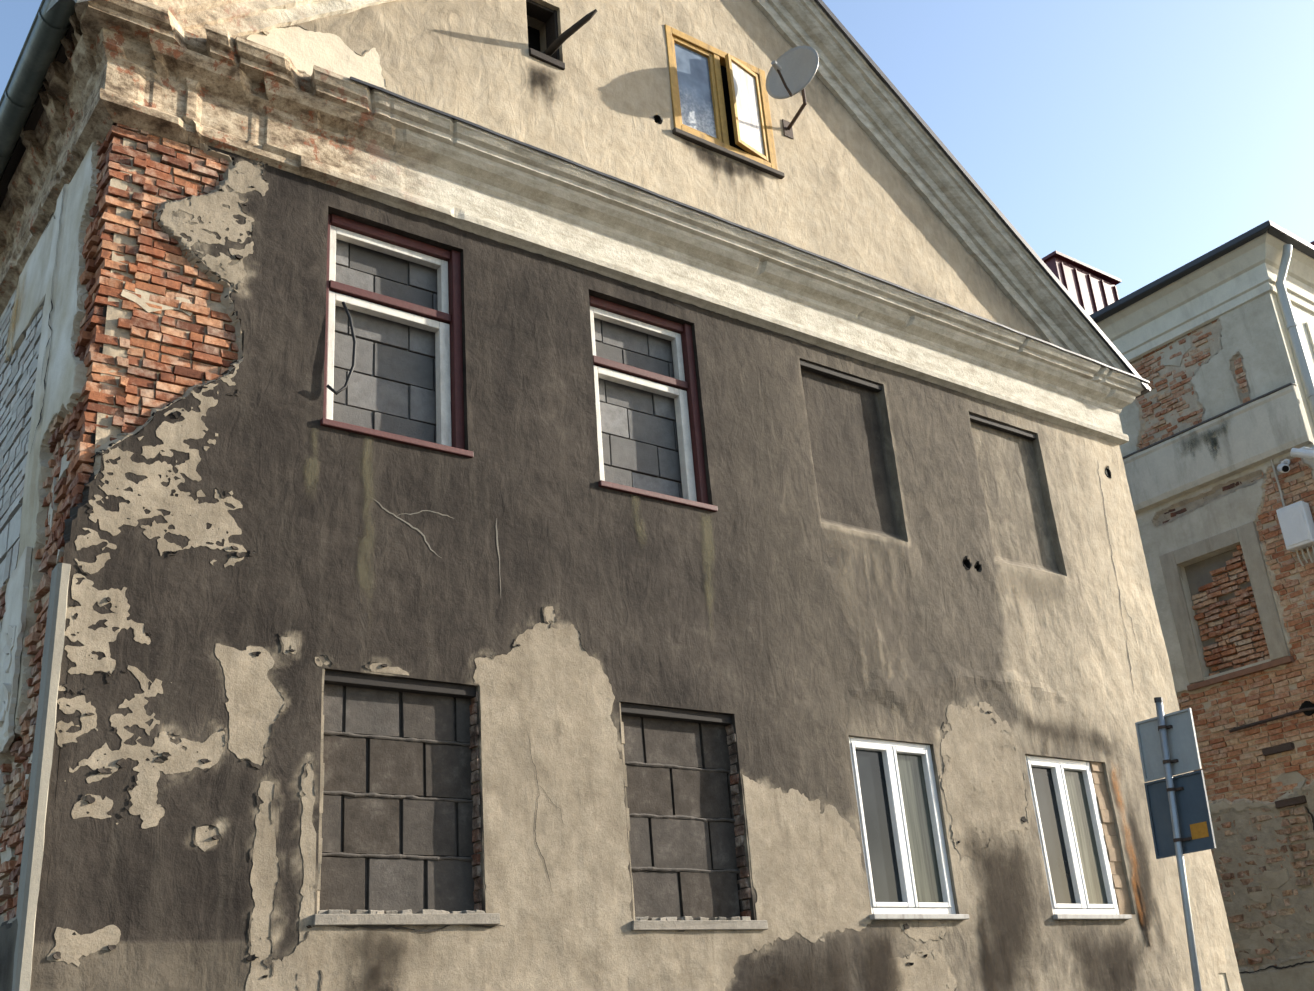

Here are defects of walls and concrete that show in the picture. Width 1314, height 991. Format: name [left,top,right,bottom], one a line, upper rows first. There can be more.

flaking render [247,24,387,89]
crack [29,187,64,458]
spalling [1130,318,1250,450]
crack [372,498,452,558]
flaking render [0,122,872,991]
crack [494,519,502,595]
spalling [1152,456,1314,810]